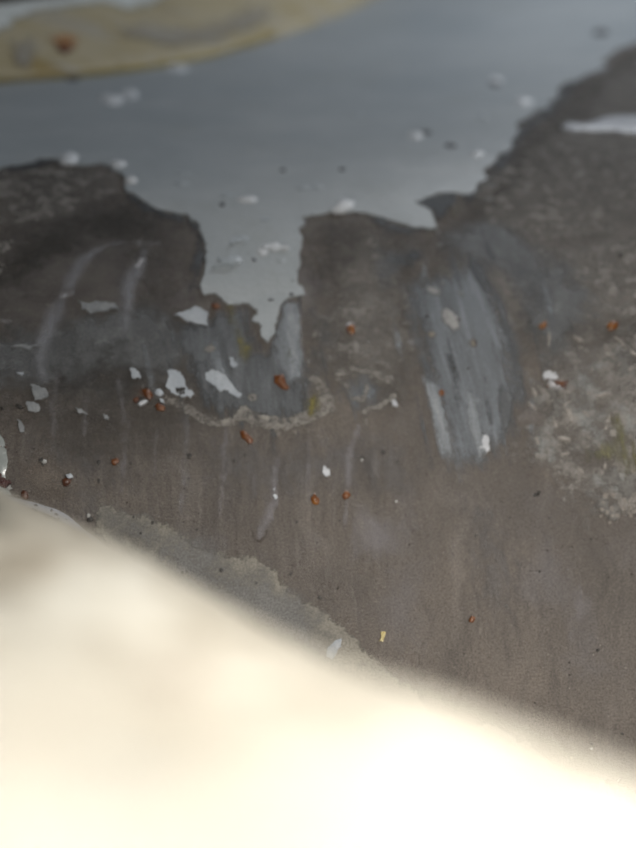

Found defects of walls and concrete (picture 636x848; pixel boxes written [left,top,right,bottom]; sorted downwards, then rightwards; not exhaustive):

peeling [415,51,636,353]
peeling [0,159,242,465]
water stain [197,340,228,404]
peeling [274,374,290,390]
water stain [421,378,451,457]
peeling [480,435,490,453]
water stain [449,255,533,457]
peeling [542,370,558,380]